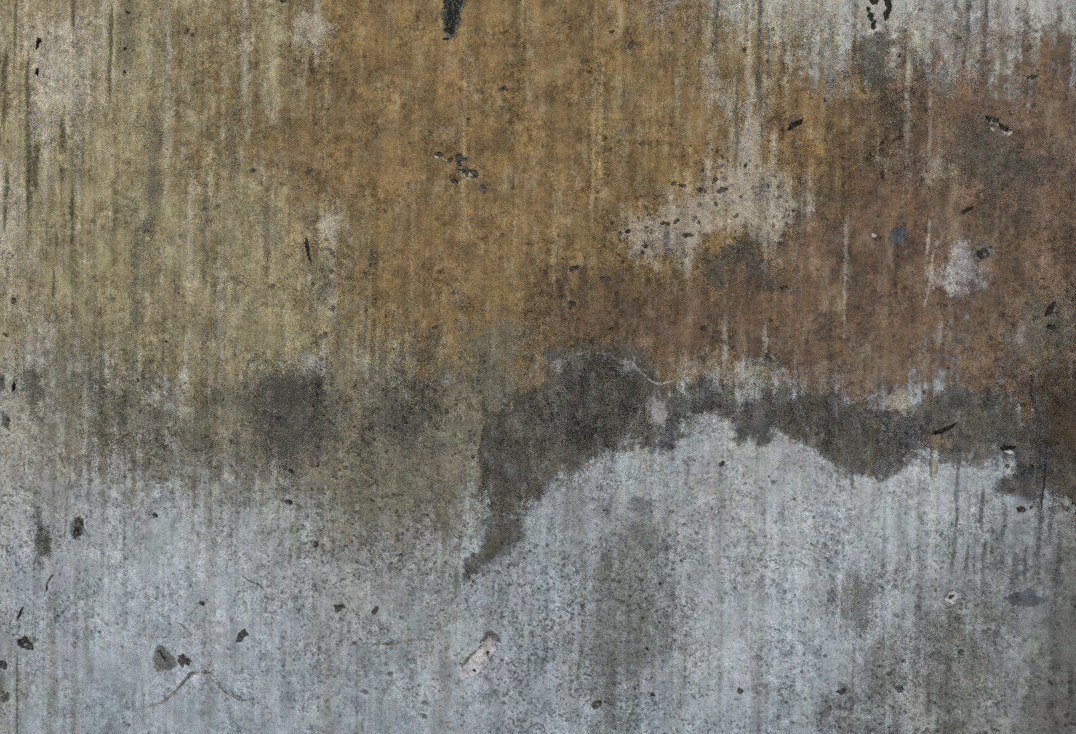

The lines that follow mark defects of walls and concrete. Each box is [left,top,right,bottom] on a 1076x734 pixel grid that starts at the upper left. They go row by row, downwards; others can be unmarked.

rust [166,0,909,401]
leakage [0,0,1076,581]
spalling [457,631,500,679]
leakage [1002,555,1046,606]